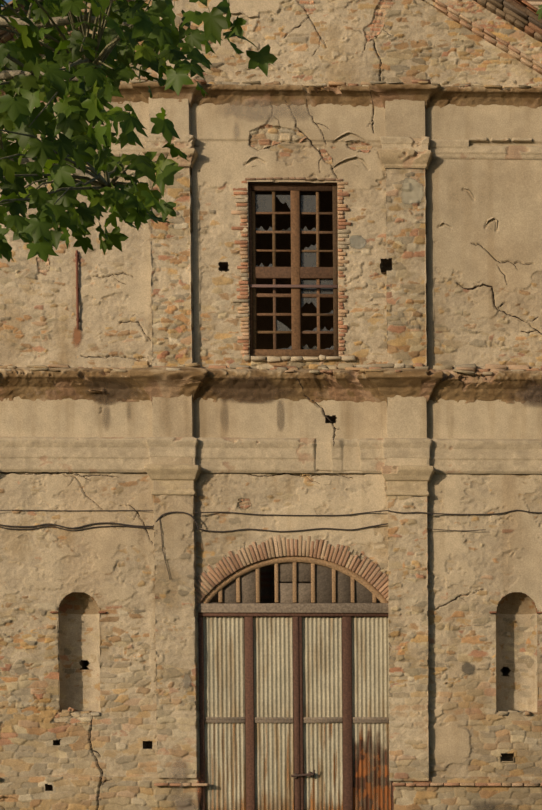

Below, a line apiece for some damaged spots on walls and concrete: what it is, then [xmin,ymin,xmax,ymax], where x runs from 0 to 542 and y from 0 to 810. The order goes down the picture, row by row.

crack [284,7,327,55]
spalling [363,0,394,42]
crack [269,99,338,179]
crack [457,243,542,334]
corrosion [73,327,81,345]
crack [296,377,339,447]
spalling [49,707,93,725]
crack [89,716,110,810]
corrosion [304,755,343,810]
corrosion [353,731,391,810]